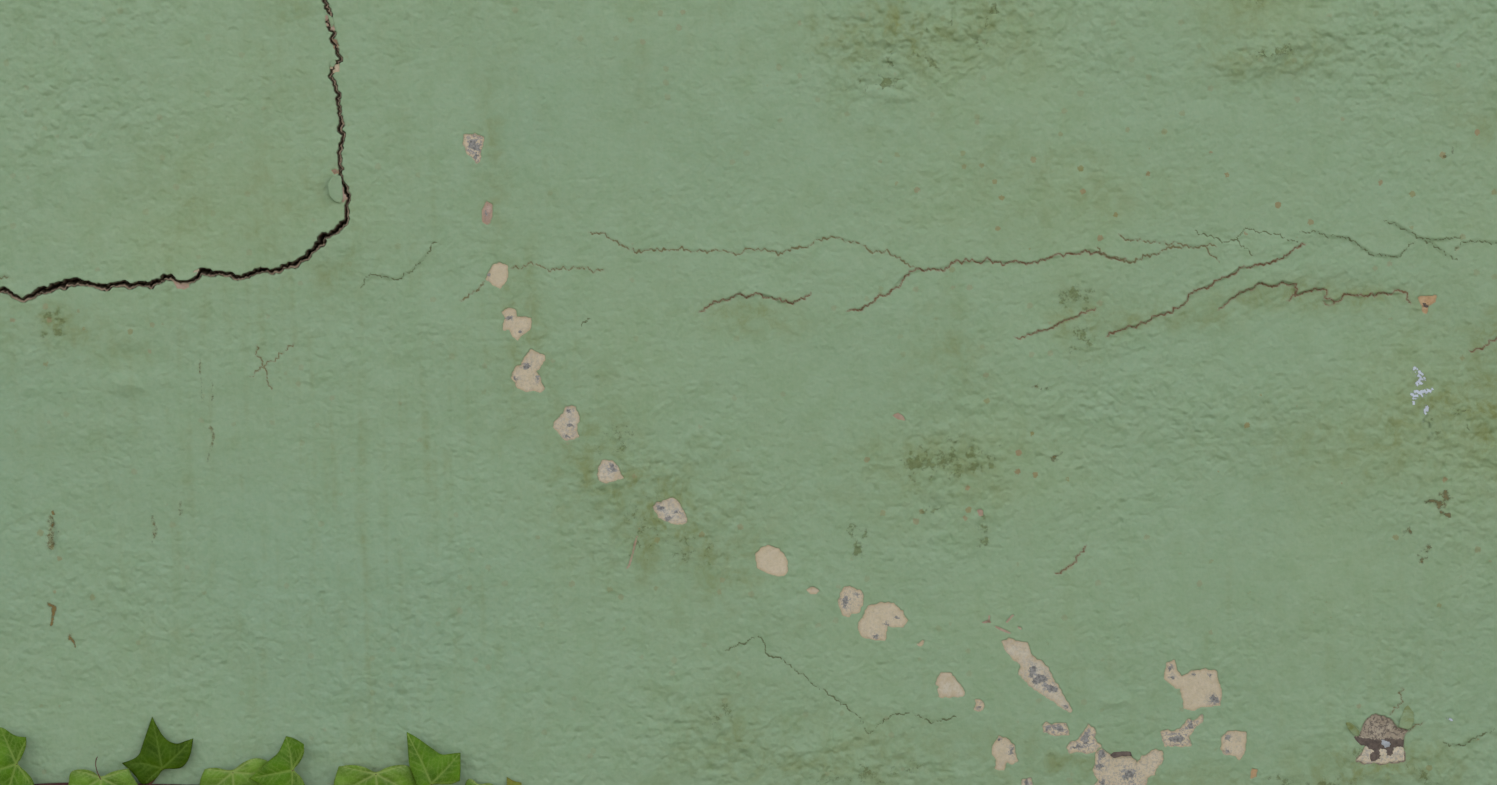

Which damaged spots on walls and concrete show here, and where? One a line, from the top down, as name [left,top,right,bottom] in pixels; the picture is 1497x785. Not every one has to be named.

crack [0,0,351,302]
crack [360,241,437,288]
crack [461,220,1496,340]
peeling [502,308,545,393]
peeling [553,406,580,441]
peeling [653,498,687,525]
peeling [755,545,788,576]
peeling [838,586,908,641]
peeling [992,736,1033,785]
peeling [1002,638,1222,785]
peeling [1220,731,1257,779]
peeling [1346,705,1414,766]